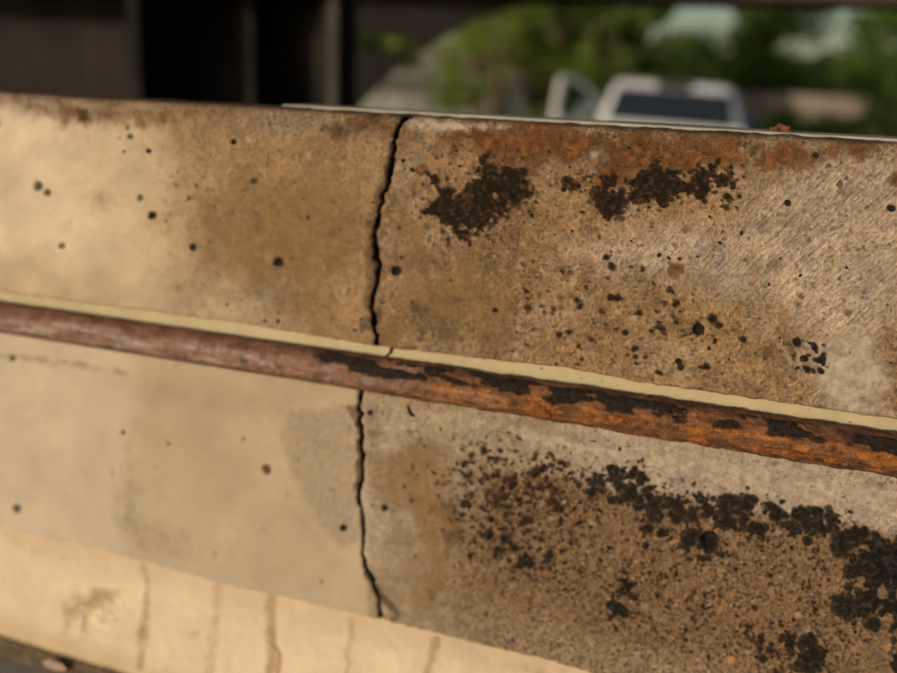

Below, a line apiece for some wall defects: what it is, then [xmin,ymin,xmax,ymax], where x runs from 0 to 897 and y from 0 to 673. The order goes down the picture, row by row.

rust [445,121,744,188]
rust [753,142,817,169]
water stain [414,148,744,246]
crack [365,114,417,357]
water stain [522,276,572,340]
water stain [591,292,651,365]
water stain [648,286,746,355]
rust [673,425,741,445]
rust [762,448,897,468]
crack [354,390,396,618]
water stain [387,431,897,673]
water stain [267,607,281,673]